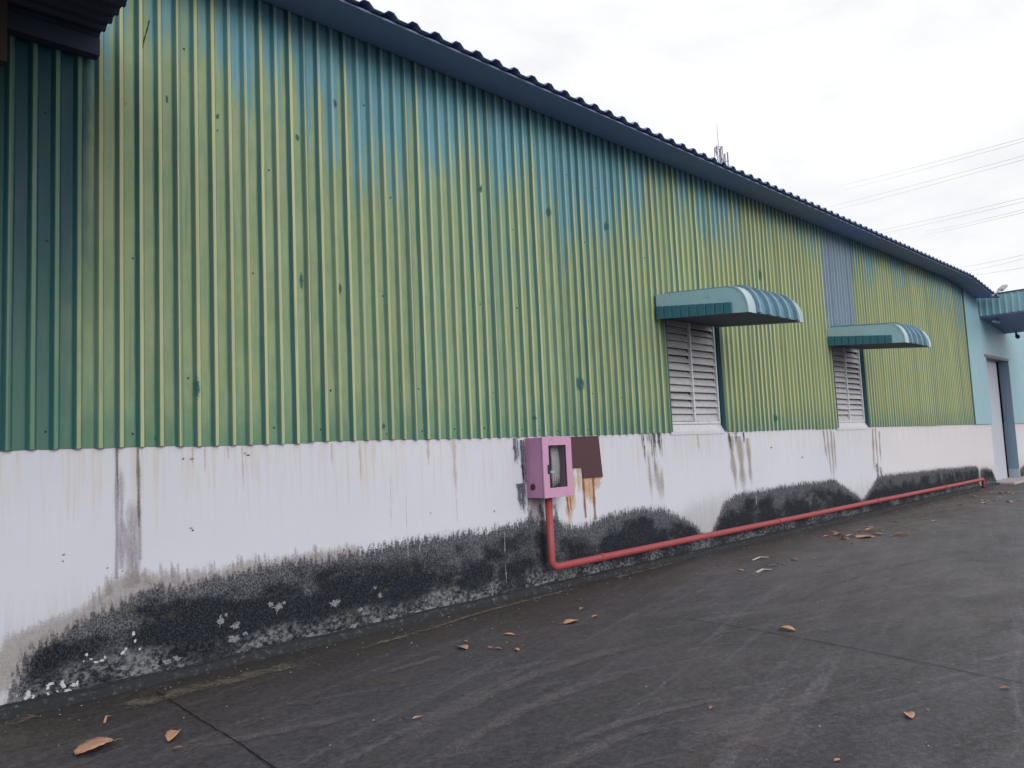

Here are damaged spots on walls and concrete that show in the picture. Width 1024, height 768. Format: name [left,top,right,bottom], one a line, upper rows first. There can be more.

rust [567,468,600,520]
damp [0,429,997,706]
damp [398,644,640,753]